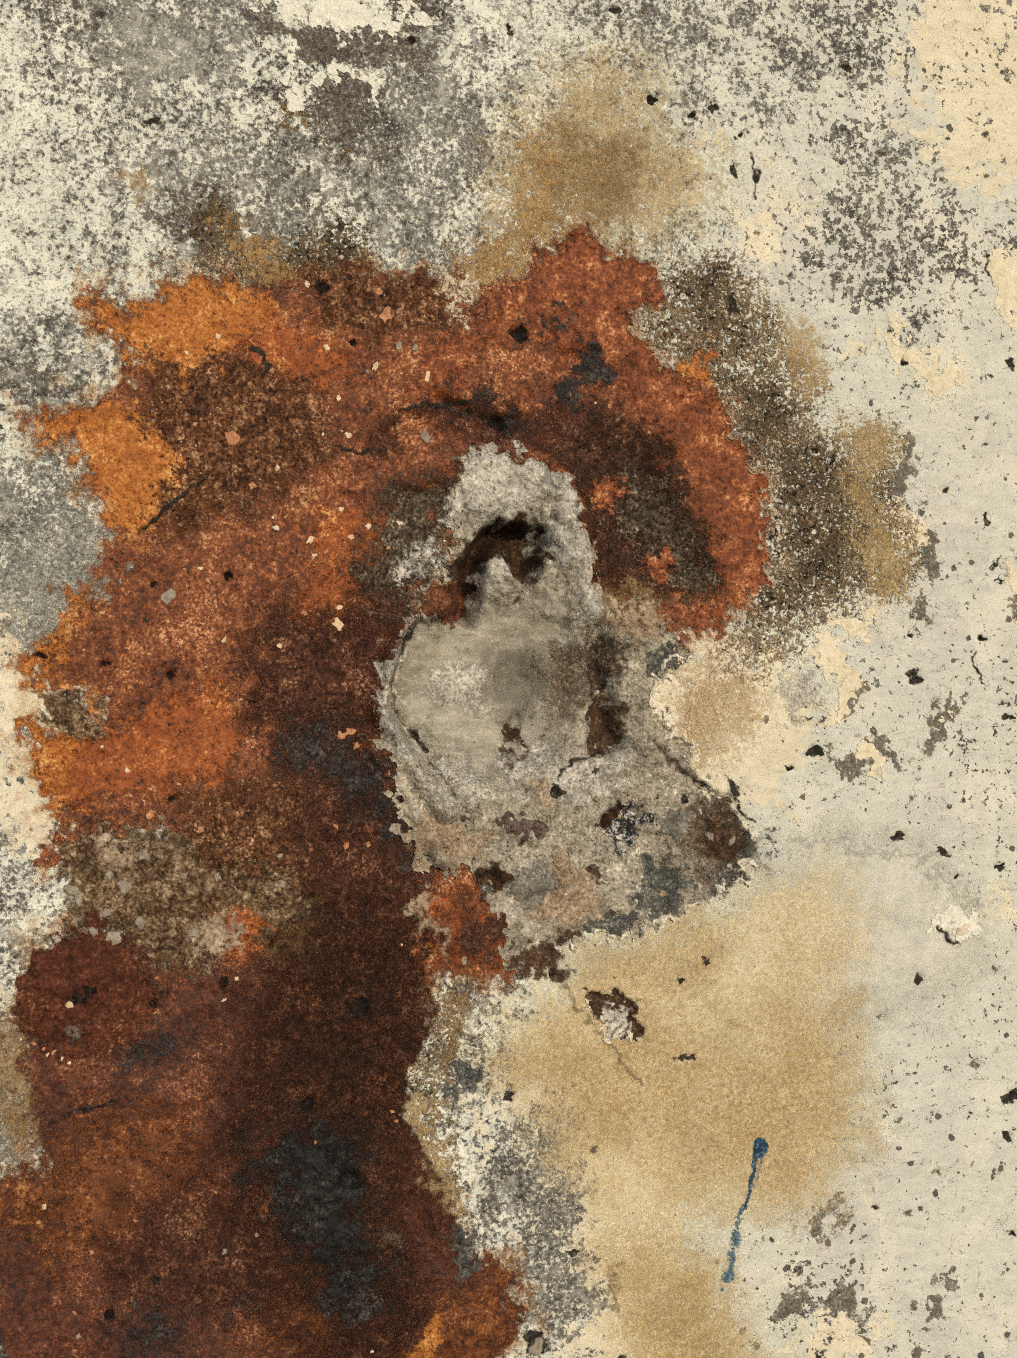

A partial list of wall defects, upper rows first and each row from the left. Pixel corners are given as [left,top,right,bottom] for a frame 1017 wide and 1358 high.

peeling [245,0,445,148]
damp [451,55,934,770]
rust [0,220,783,1358]
spalling [371,435,775,983]
spalling [583,977,646,1055]
damp [406,865,874,1358]